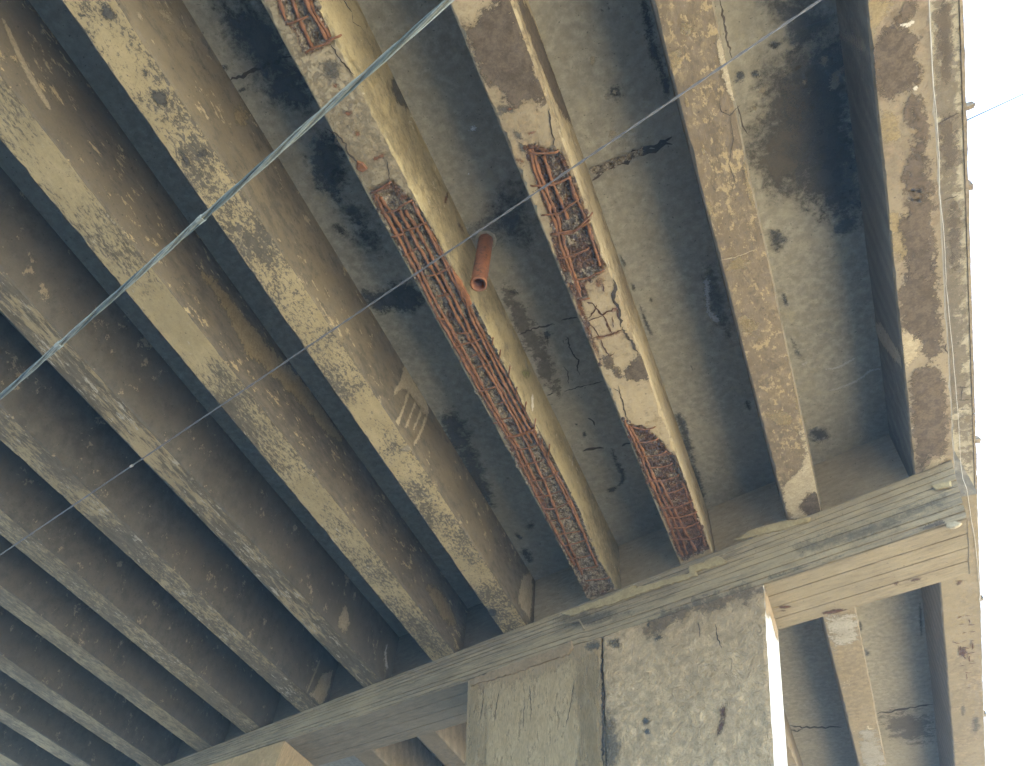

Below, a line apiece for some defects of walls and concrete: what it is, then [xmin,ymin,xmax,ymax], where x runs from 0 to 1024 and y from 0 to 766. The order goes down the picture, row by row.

water stain [212,0,317,113]
spalling [276,0,342,55]
water stain [324,60,341,79]
water stain [305,130,381,252]
spalling [523,143,605,367]
crack [592,137,672,188]
water stain [735,0,861,234]
water stain [873,0,963,470]
spalling [370,179,614,598]
crack [563,280,638,383]
spalling [621,417,710,561]